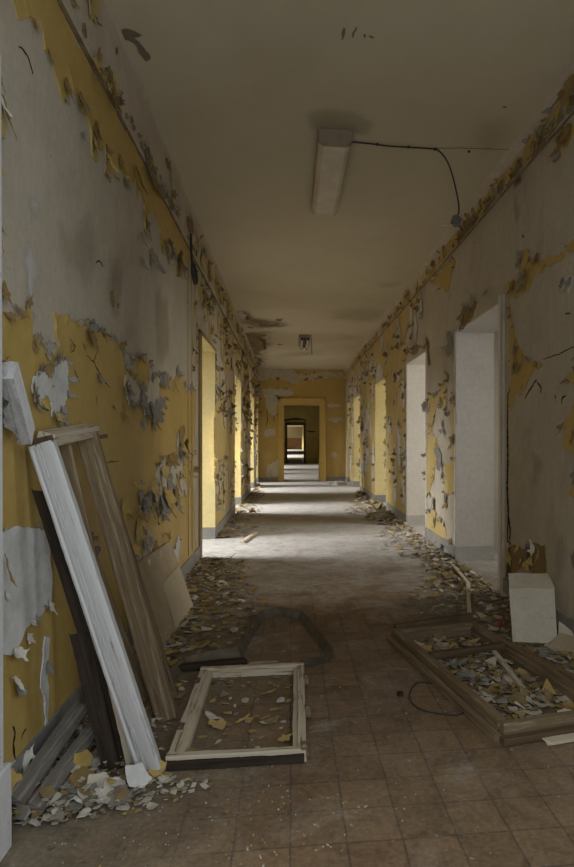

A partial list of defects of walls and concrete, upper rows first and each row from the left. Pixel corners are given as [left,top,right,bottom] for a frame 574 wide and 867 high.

peeling [1,76,17,139]
peeling [13,0,574,550]
peeling [2,280,205,796]
peeling [504,538,547,579]
peeling [202,697,262,730]